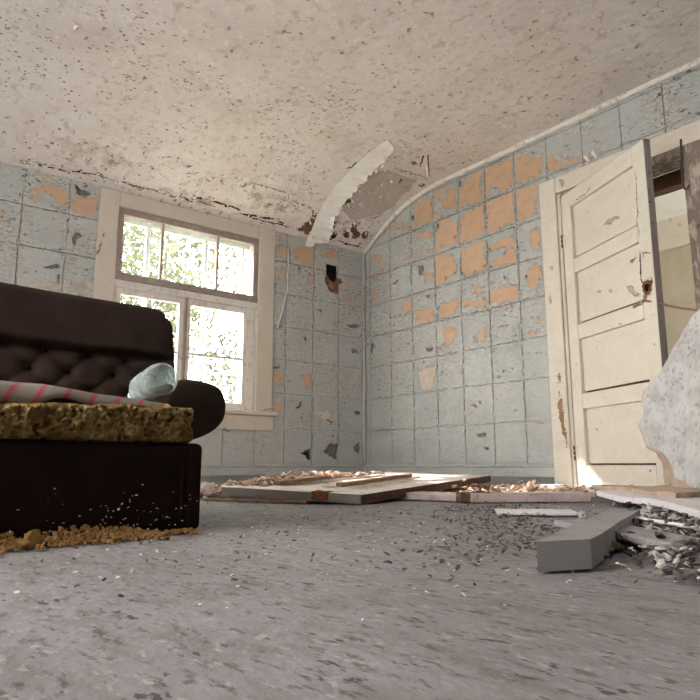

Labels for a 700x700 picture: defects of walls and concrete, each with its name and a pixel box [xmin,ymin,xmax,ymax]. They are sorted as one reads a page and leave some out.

peeling [27,184,99,218]
crack [0,154,550,463]
spalling [296,208,319,234]
peeling [275,243,354,304]
peeling [329,140,580,352]
peeling [555,372,569,448]